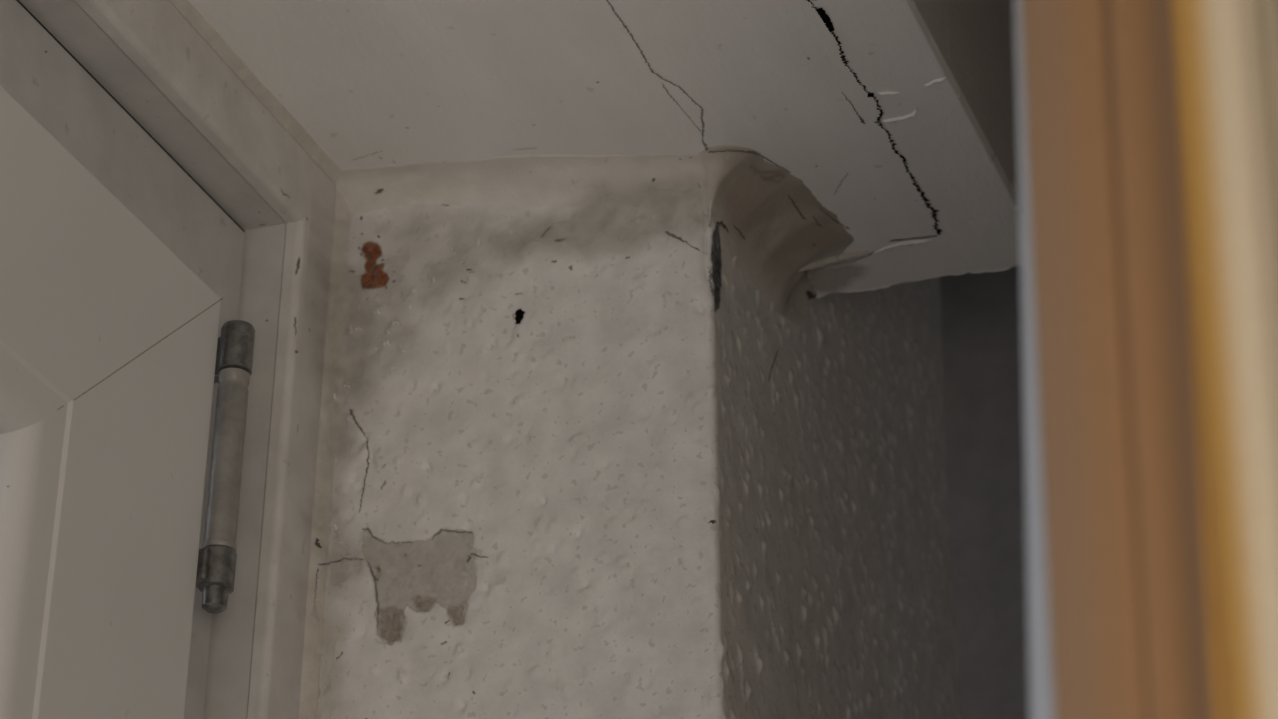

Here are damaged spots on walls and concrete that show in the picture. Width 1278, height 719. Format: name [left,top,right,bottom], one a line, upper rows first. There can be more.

crack [606,0,708,151]
crack [807,0,942,241]
rust [358,233,395,300]
peeling [362,528,476,644]